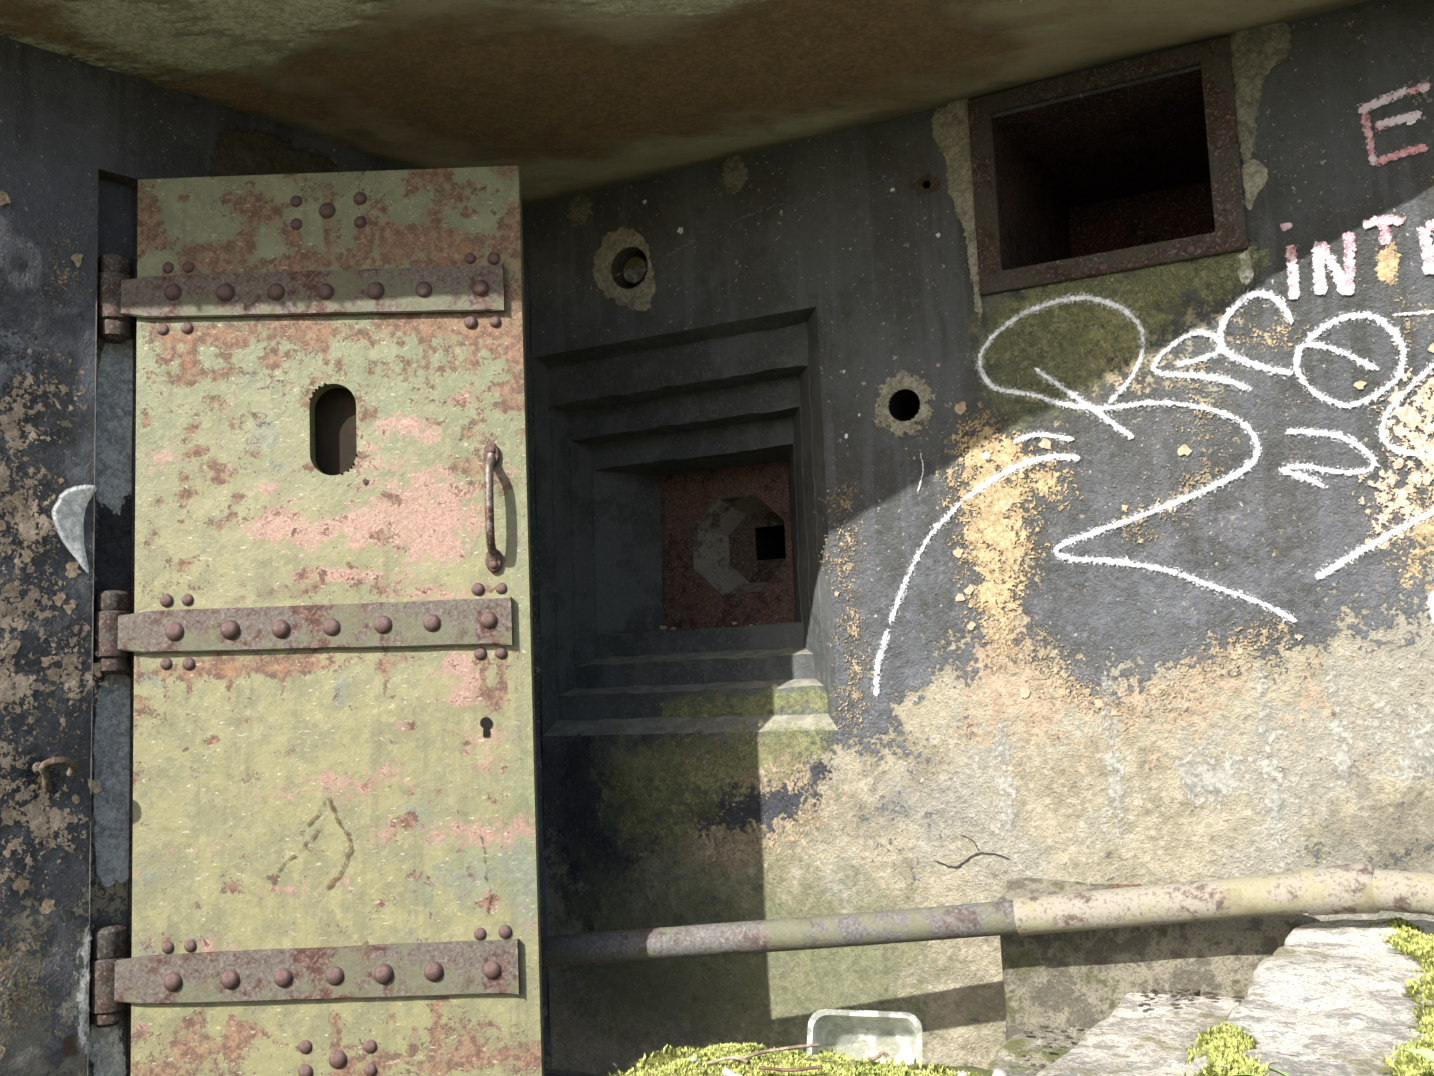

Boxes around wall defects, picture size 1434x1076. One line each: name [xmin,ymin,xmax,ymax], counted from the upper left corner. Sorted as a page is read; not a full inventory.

damp [0,0,398,89]
damp [539,0,765,21]
spalling [592,226,656,311]
peeling [1374,241,1434,353]
peeling [1345,368,1434,607]
peeling [858,363,1303,743]
spalling [0,338,133,1067]